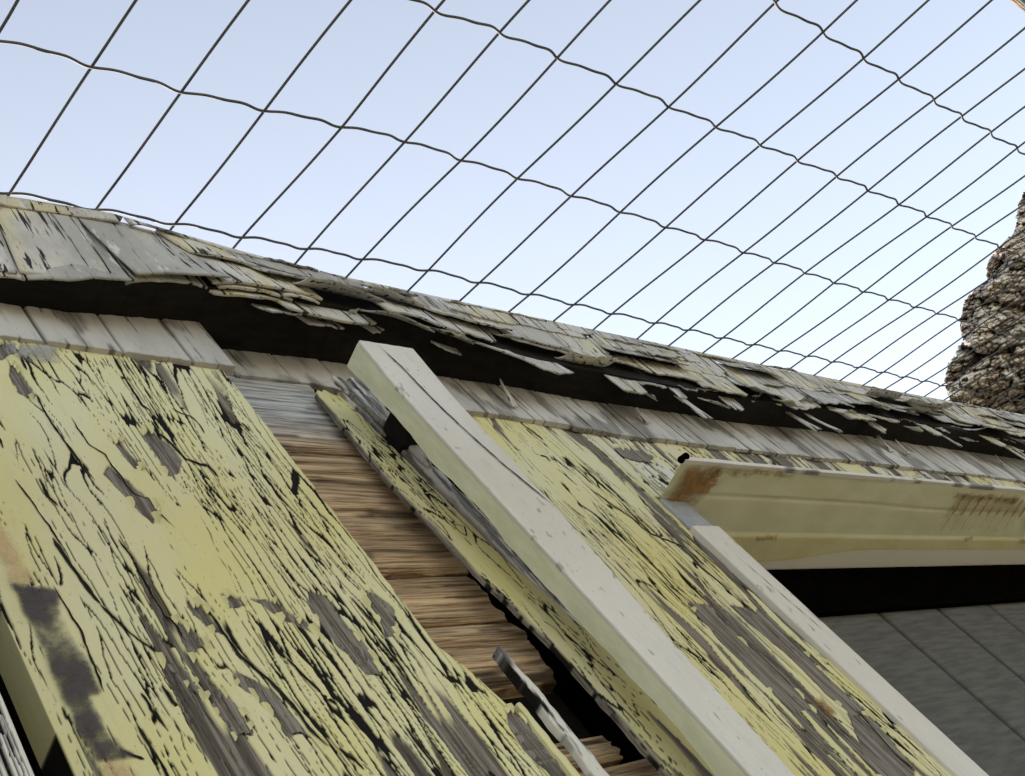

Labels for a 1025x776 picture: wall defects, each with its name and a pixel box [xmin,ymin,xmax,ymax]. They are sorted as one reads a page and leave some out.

peeling [0,339,35,400]
peeling [109,432,146,471]
peeling [139,422,180,476]
peeling [615,444,656,465]
peeling [105,467,161,523]
corrosion [670,468,783,506]
corrosion [944,494,1025,541]
peeling [360,590,401,640]
peeling [154,588,382,741]
spalling [467,570,646,765]
peeling [688,603,817,713]
peeling [729,603,914,776]